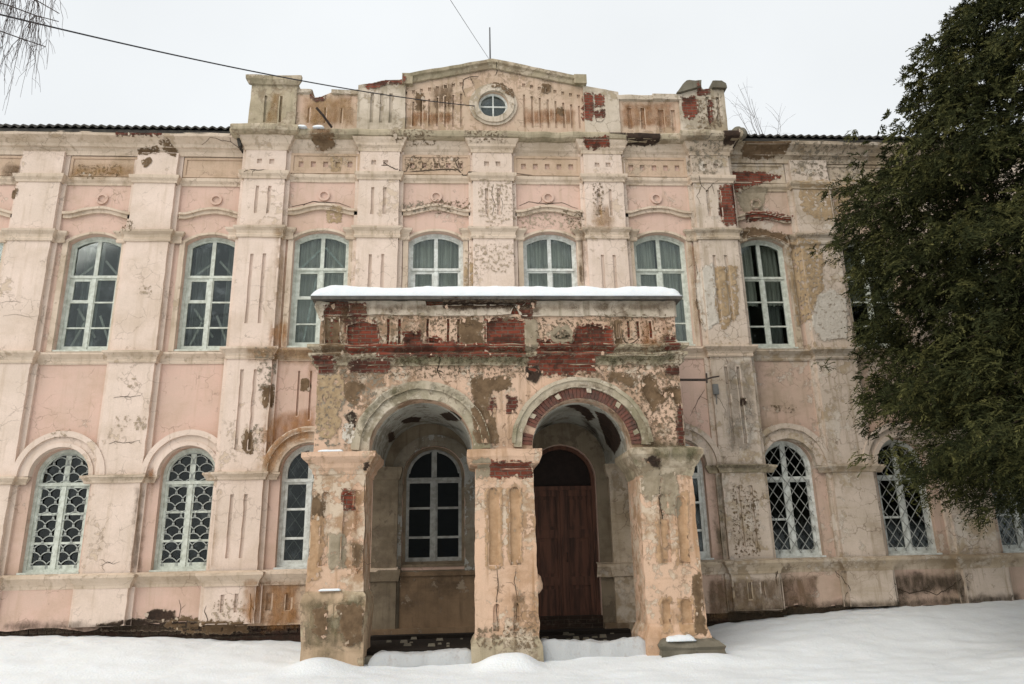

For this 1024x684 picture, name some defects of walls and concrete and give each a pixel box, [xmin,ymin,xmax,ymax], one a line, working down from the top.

spalling [581,92,606,121]
peeling [680,81,875,342]
spalling [300,244,691,582]
peeling [241,424,266,455]
spalling [658,572,708,636]
water stain [710,572,1017,622]
crack [895,575,968,595]